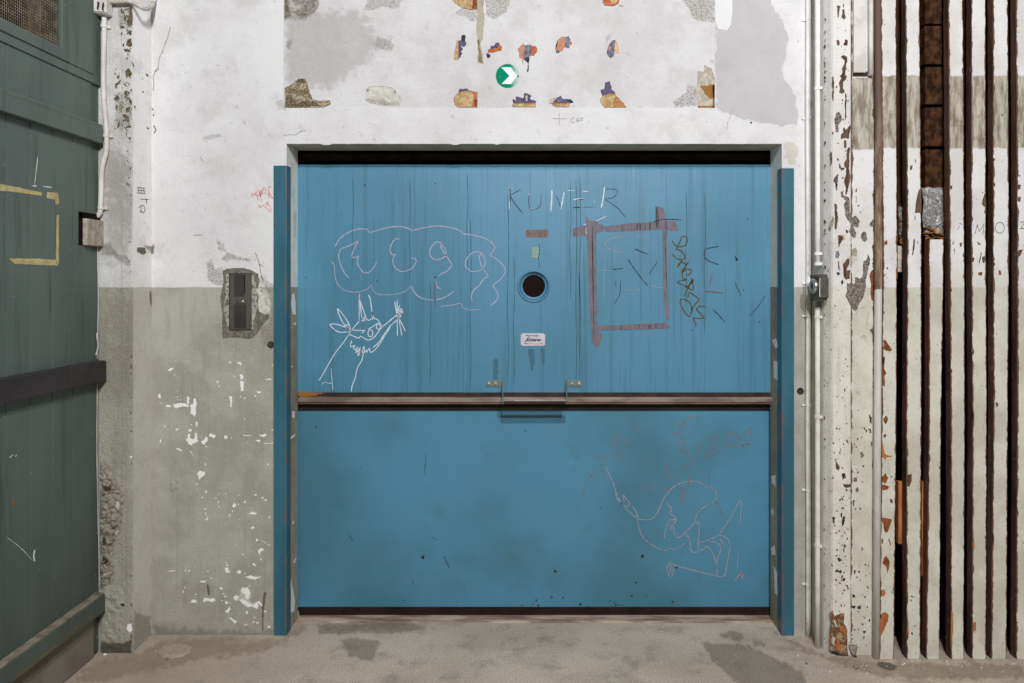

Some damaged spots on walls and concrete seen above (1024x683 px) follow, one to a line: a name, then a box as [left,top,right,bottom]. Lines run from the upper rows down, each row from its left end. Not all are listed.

flaking render [453,0,502,63]
peeling [518,43,537,72]
peeling [555,36,572,53]
peeling [114,6,149,205]
spalling [284,78,331,108]
flaking render [453,89,478,108]
flaking render [512,93,536,107]
flaking render [549,96,573,107]
flaking render [600,81,626,108]
peeling [824,4,898,310]
spalling [158,394,273,456]
spalling [183,464,270,628]